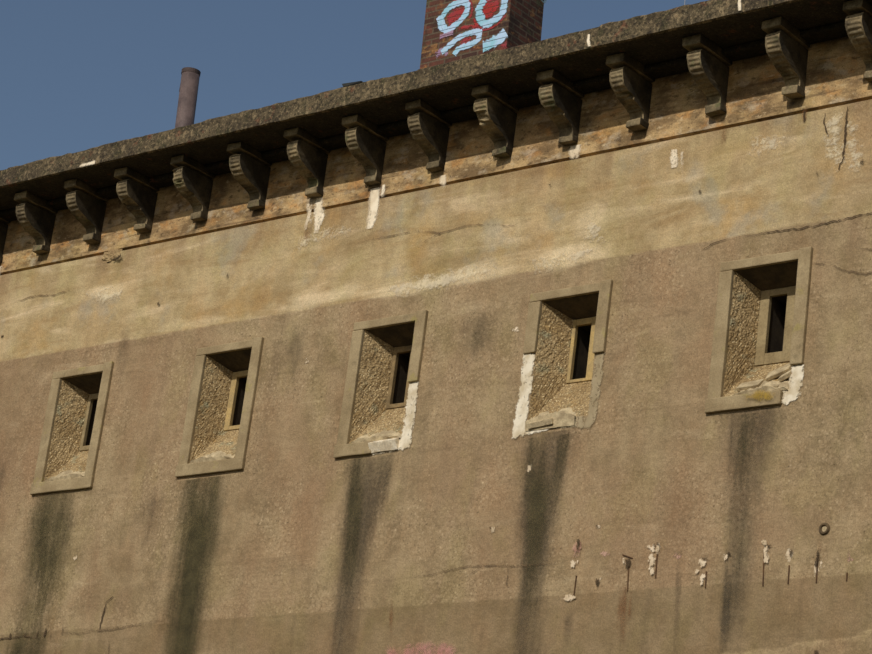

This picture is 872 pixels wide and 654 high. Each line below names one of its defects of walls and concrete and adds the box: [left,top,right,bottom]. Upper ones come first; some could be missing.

crack [803,106,848,170]
damp [301,197,349,246]
damp [367,184,385,229]
crack [703,212,872,250]
crack [817,263,872,275]
spalling [372,381,418,455]
spalling [512,353,604,439]
spalling [782,364,804,405]
damp [29,495,67,613]
damp [169,476,219,654]
damp [336,458,377,645]
damp [521,437,565,611]